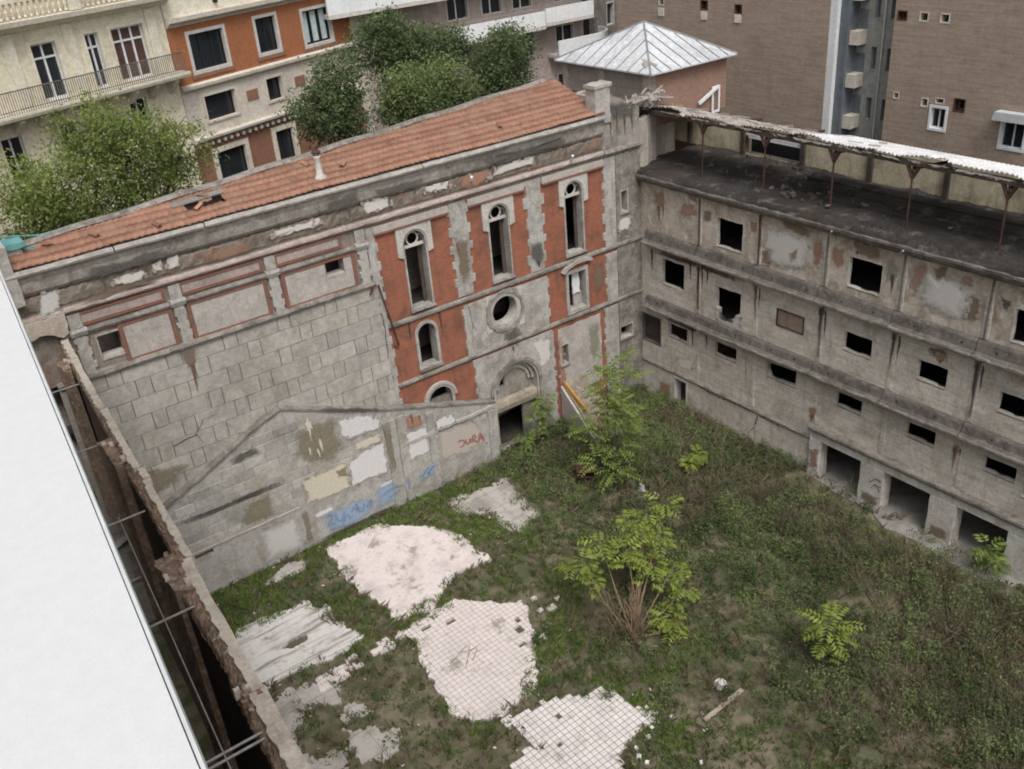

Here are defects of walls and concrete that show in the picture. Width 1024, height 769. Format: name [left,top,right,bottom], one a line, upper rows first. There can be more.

peeling [423,155,537,194]
peeling [361,196,394,213]
peeling [269,218,324,240]
peeling [110,255,180,287]
peeling [960,275,982,320]
damp [889,332,901,369]
damp [972,361,984,397]
damp [305,418,323,457]
peeling [339,416,383,450]
peeling [301,462,360,504]